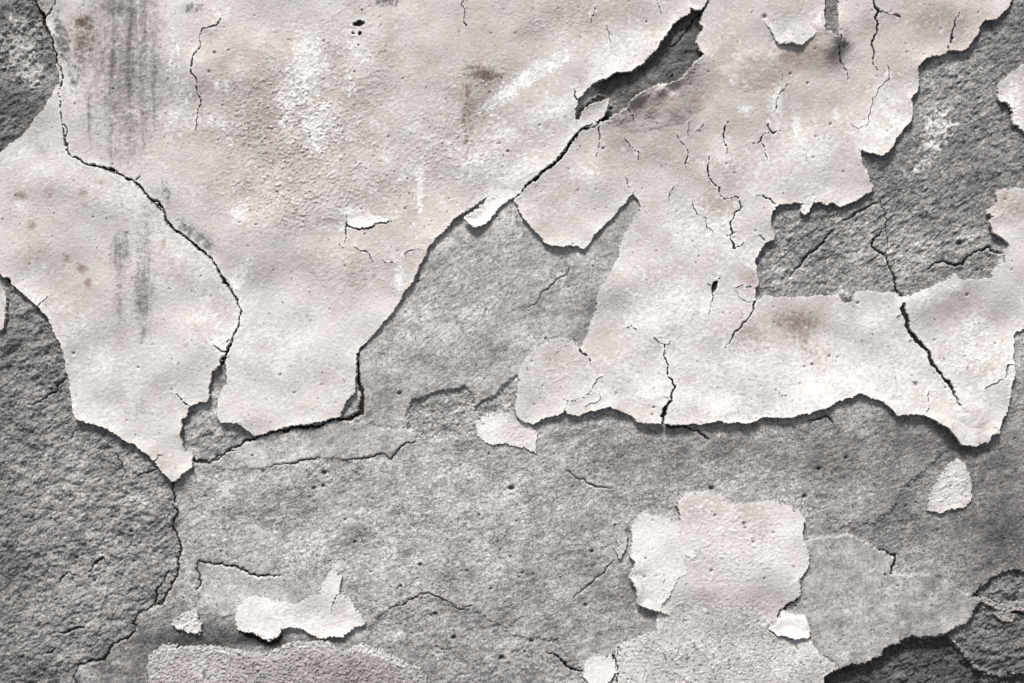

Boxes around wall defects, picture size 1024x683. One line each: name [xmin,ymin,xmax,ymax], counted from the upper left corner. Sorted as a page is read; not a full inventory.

crack [34,0,64,87]
crack [191,19,221,130]
peeling [0,0,242,683]
crack [61,113,242,365]
peeling [36,0,1024,461]
crack [627,327,708,439]
crack [669,83,788,249]
crack [707,275,755,347]
crack [789,200,963,408]
crack [927,246,1002,270]
peeling [146,490,1024,683]
spalling [841,451,972,557]